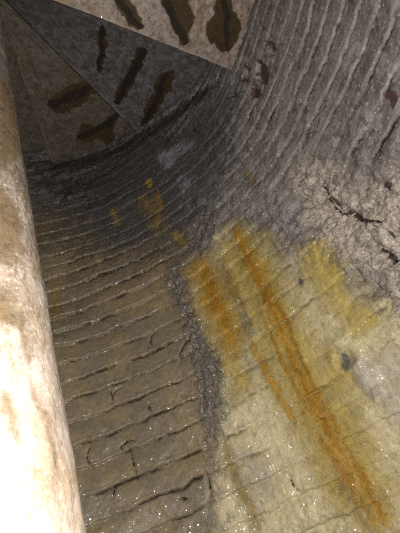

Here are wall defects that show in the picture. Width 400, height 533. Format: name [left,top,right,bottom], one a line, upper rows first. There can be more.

crack [327,191,382,229]
rust [186,258,244,354]
rust [233,226,398,531]